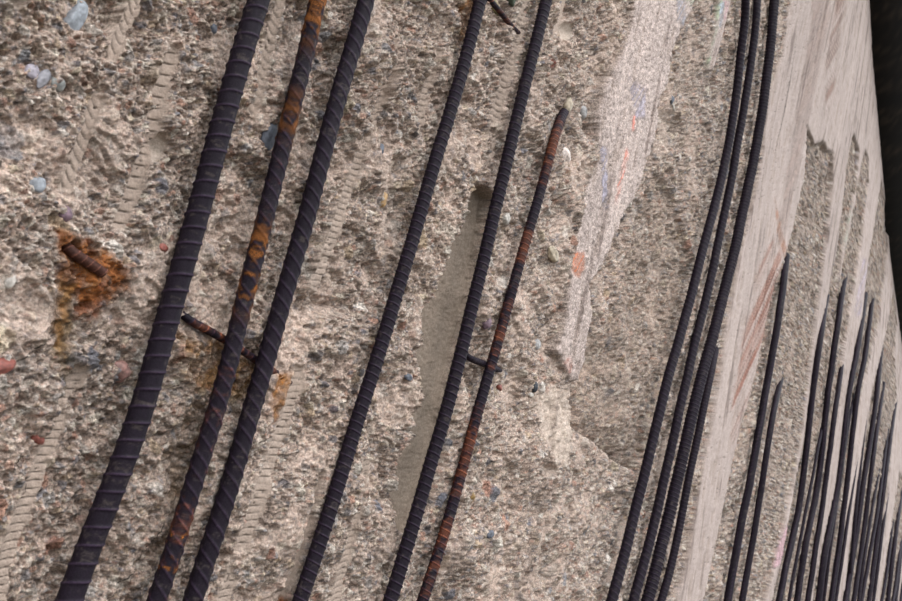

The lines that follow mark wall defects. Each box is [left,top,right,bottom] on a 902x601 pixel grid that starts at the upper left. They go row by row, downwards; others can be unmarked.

corrosion [56,230,128,344]
spalling [0,0,487,601]
corrosion [273,375,289,417]
spalling [308,0,790,601]